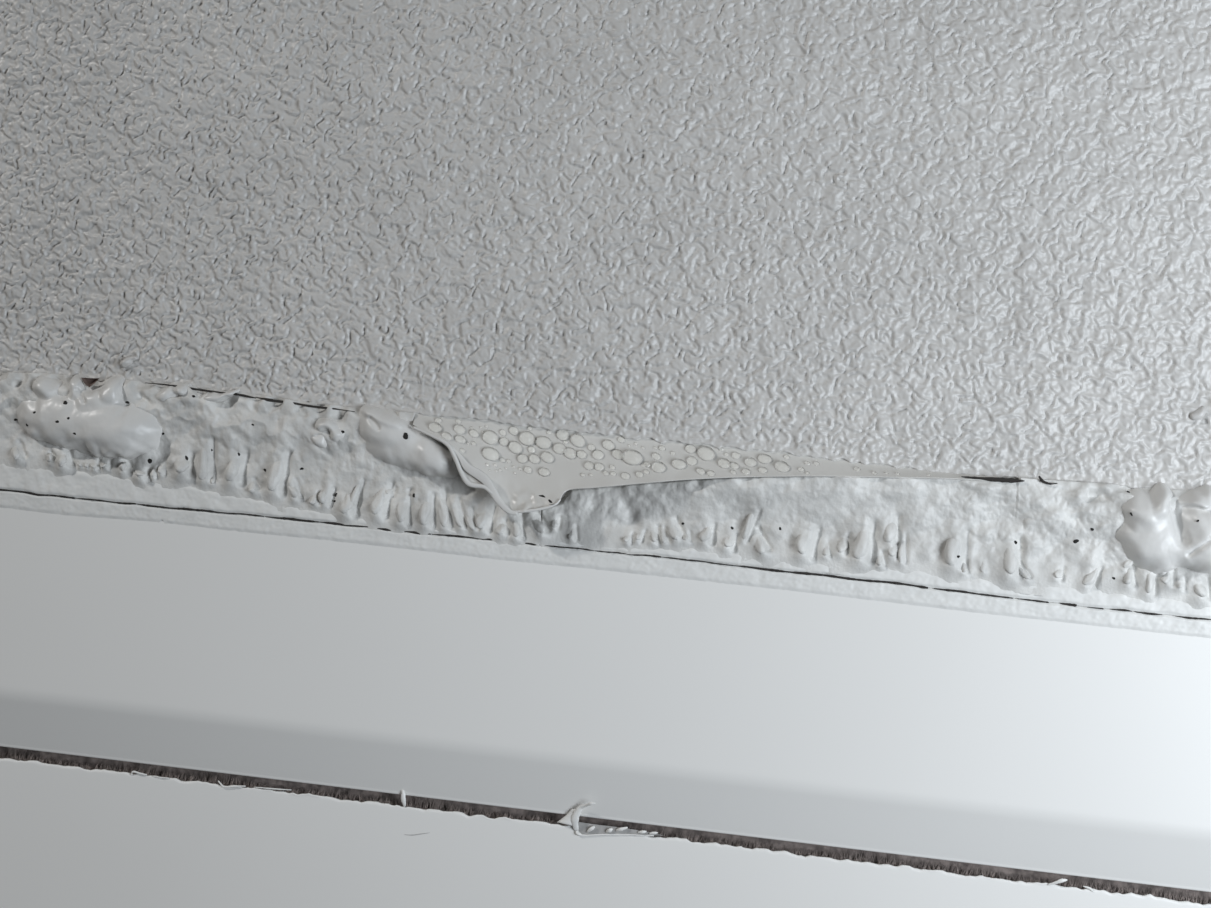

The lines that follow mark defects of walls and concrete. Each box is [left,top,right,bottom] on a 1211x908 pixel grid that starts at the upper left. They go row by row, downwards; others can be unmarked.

peeling [412,413,1018,515]
peeling [558,802,664,836]